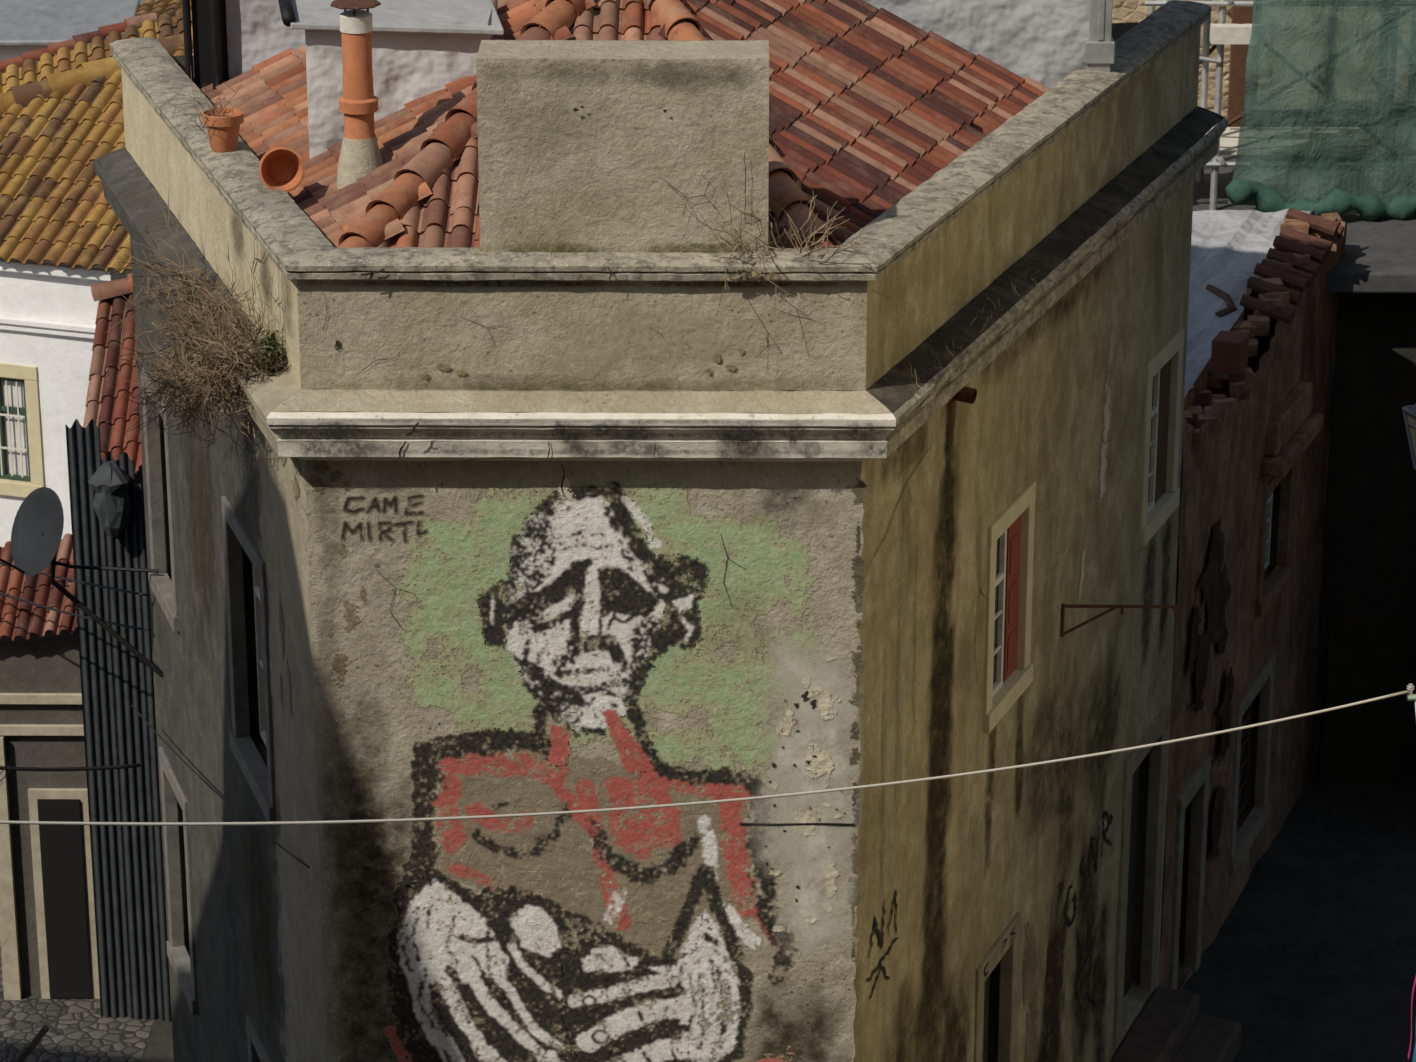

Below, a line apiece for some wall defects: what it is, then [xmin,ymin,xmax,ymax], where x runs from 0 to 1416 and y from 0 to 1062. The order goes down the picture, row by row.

water stain [283,422,374,443]
water stain [391,420,882,464]
crack [381,575,414,630]
crack [721,536,745,605]
peeling [776,478,867,962]
water stain [897,399,956,1062]